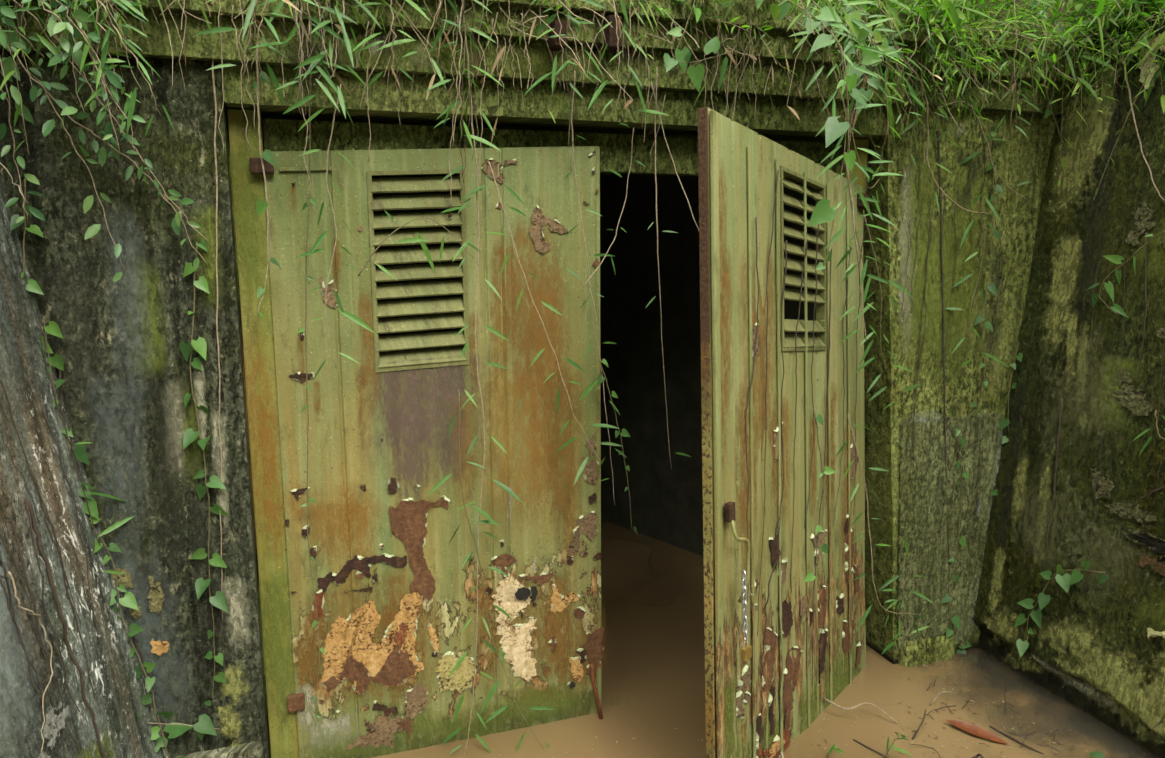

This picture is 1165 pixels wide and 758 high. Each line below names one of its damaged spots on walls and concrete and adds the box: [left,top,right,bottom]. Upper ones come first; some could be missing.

water stain [899,169,913,335]
rust [289,329,318,386]
water stain [977,54,1152,596]
water stain [157,366,228,537]
peeling [291,487,310,502]
peeling [285,519,317,558]
peeling [566,435,601,565]
water stain [206,581,247,661]
peeling [317,543,477,751]
peeling [485,573,581,681]
peeling [567,626,604,689]